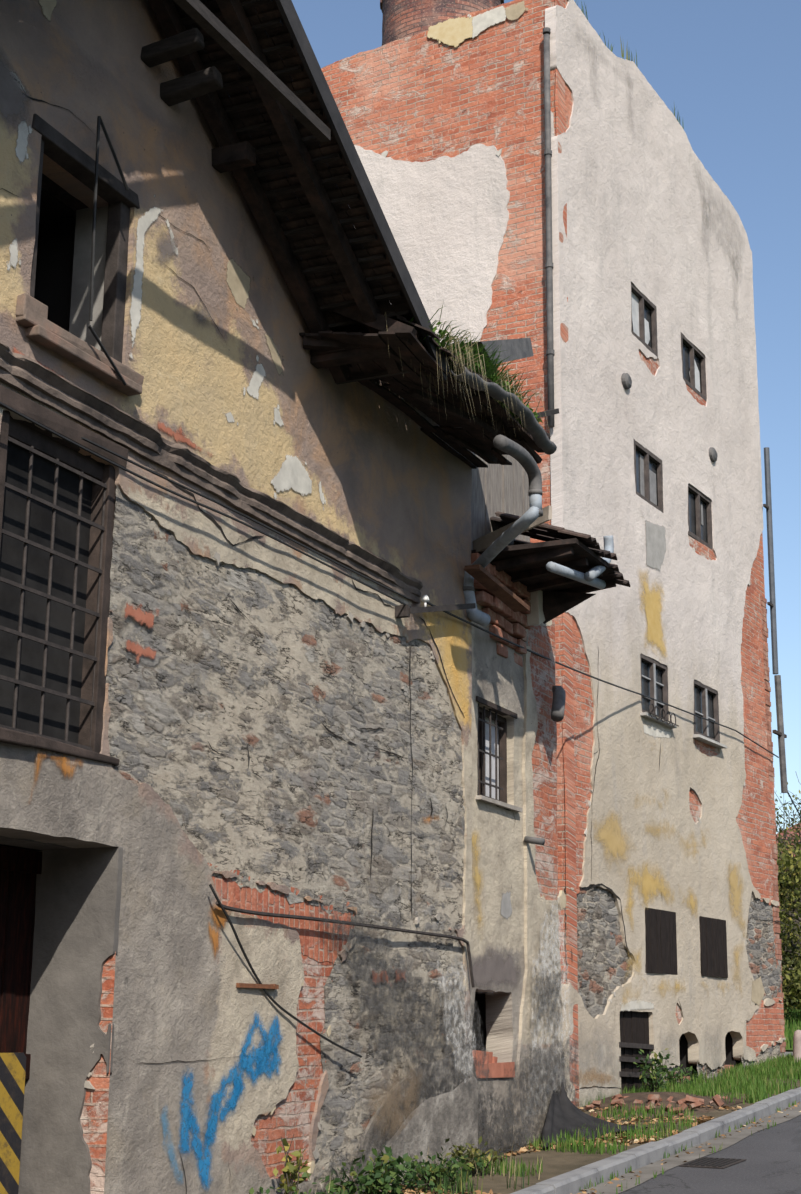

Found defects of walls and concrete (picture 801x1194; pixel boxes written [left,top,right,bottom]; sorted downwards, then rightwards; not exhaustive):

peeling [15,121,33,163]
crack [18,81,96,136]
peeling [129,195,178,358]
spalling [321,0,573,433]
peeling [270,455,326,510]
spalling [536,452,551,525]
spalling [106,484,466,1191]
spalling [528,612,654,1107]
spalling [736,533,785,1069]
spalling [80,951,116,1194]
spalling [697,1062,725,1079]